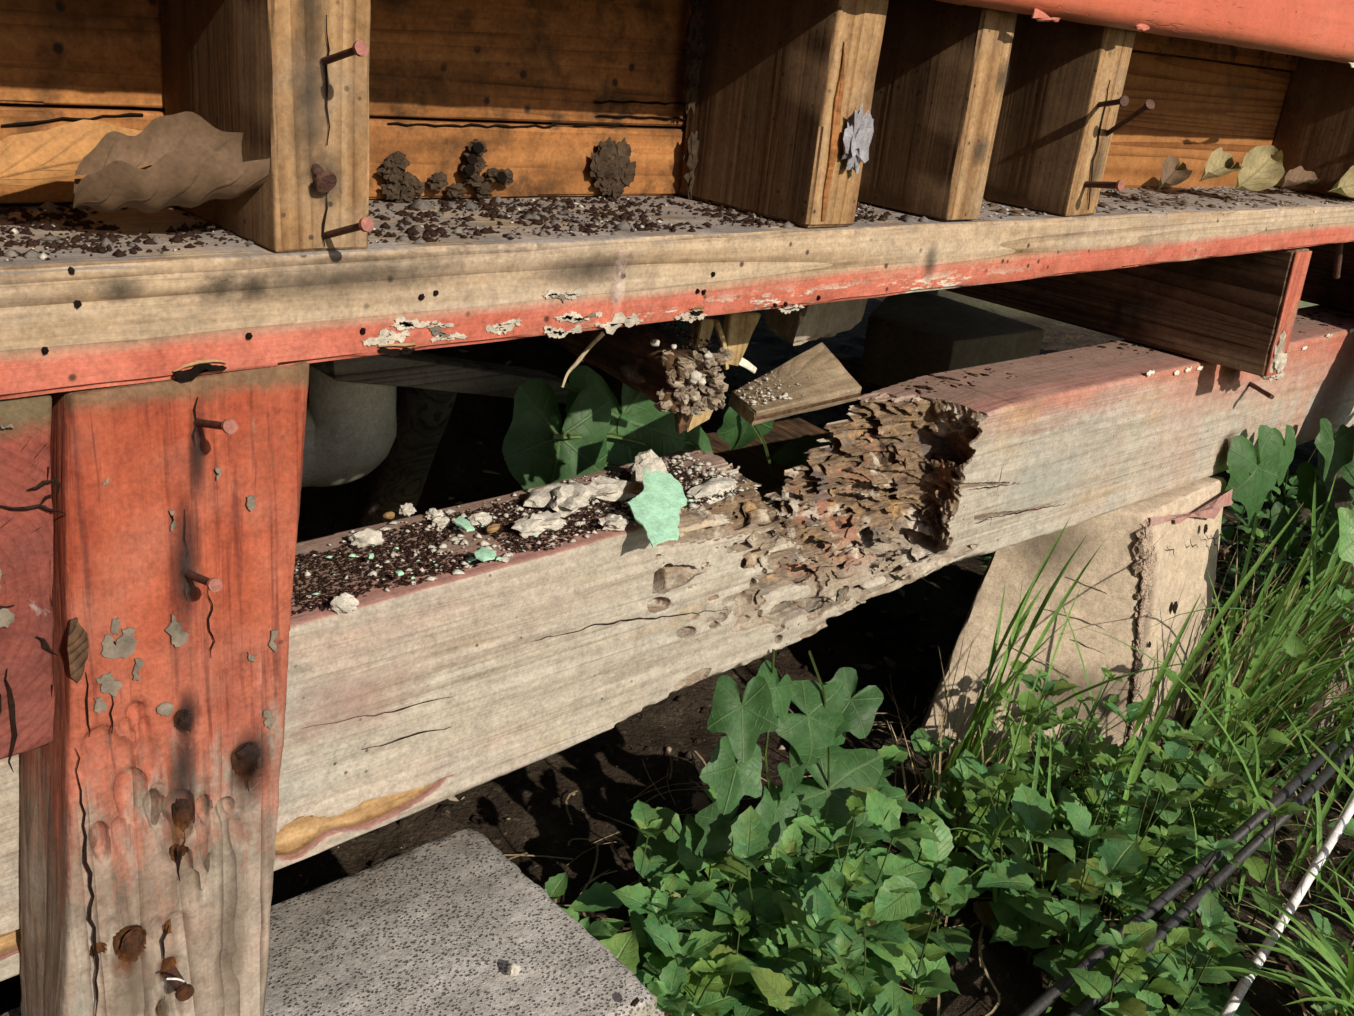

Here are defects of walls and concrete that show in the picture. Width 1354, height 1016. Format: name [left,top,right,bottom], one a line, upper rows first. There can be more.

peeling [362,316,470,352]
peeling [485,317,522,335]
peeling [543,288,643,339]
peeling [662,307,707,336]
peeling [779,304,804,314]
peeling [730,437,942,621]
peeling [0,608,15,628]
crack [36,636,58,656]
peeling [247,630,279,662]
crack [0,669,18,772]
crack [75,672,114,1016]
corrosion [118,930,143,971]